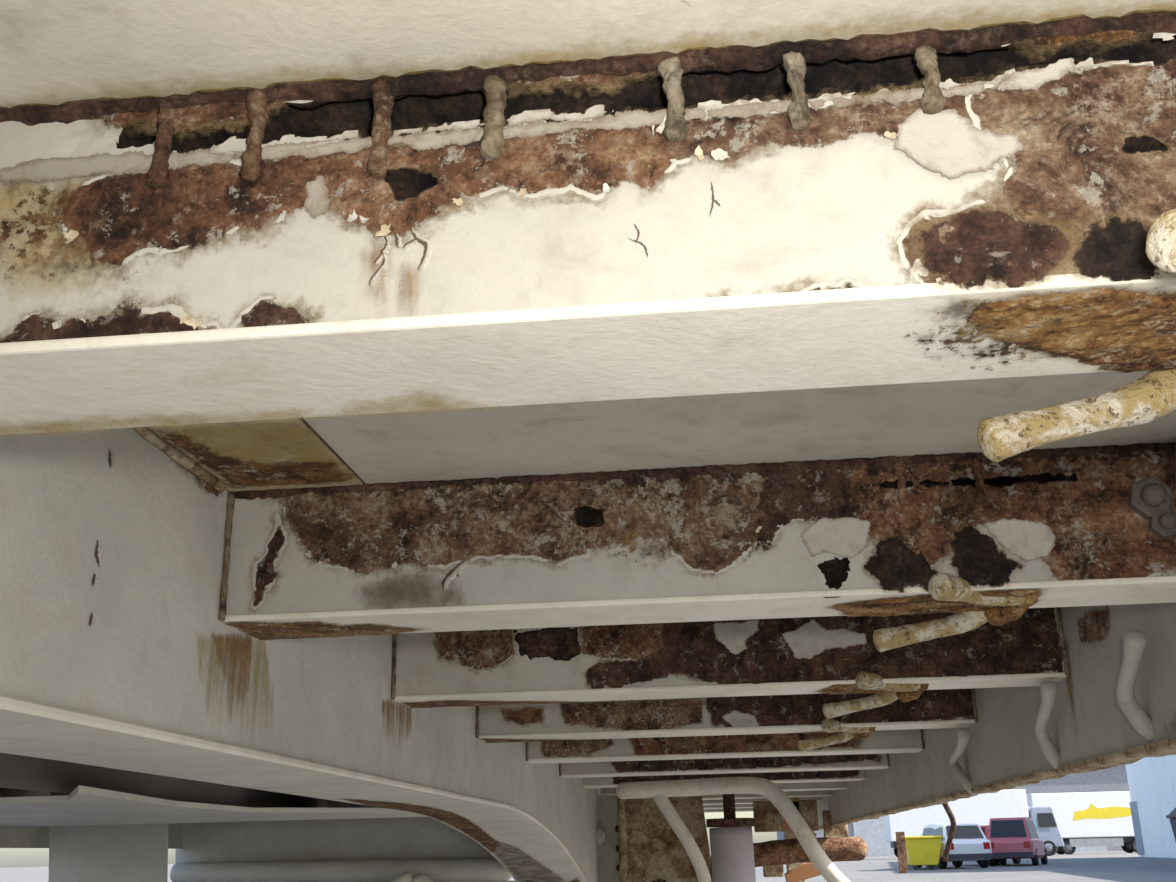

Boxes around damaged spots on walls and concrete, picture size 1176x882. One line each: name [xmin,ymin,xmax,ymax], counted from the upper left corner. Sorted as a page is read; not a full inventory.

peeling [168,136,247,170]
peeling [261,130,373,160]
peeling [387,119,485,151]
corrosion [0,86,922,281]
peeling [503,104,667,139]
peeling [810,58,1076,179]
crack [369,226,433,287]
crack [628,224,648,257]
corrosion [895,60,1176,373]
corrosion [0,293,320,343]
corrosion [157,420,1176,784]
corrosion [343,799,580,882]